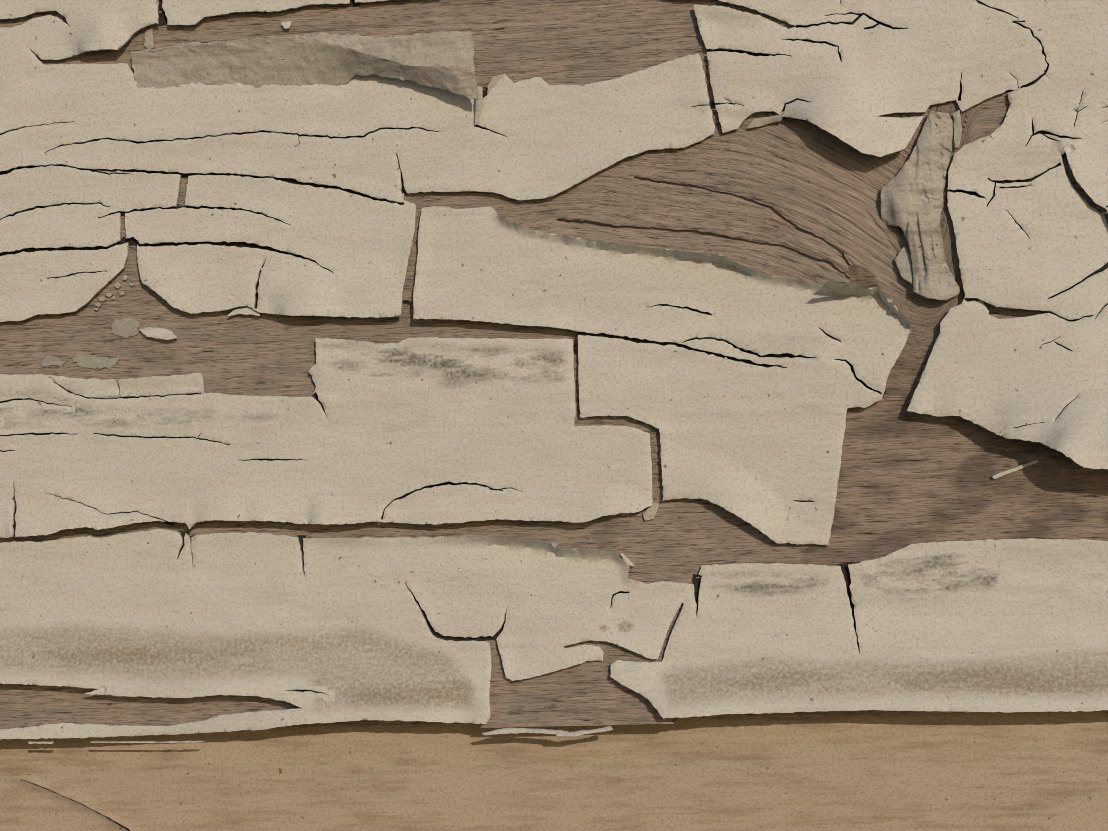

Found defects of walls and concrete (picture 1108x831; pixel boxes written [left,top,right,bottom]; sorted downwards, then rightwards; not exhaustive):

peeling [31,0,797,125]
crack [693,1,908,118]
crack [976,0,1049,93]
crack [0,122,439,309]
crack [558,176,851,279]
crack [948,92,1108,239]
peeling [0,88,1108,592]
crack [968,263,1108,351]
crack [0,382,303,461]
crack [381,481,522,519]
crack [407,586,507,641]
peeling [481,603,684,728]